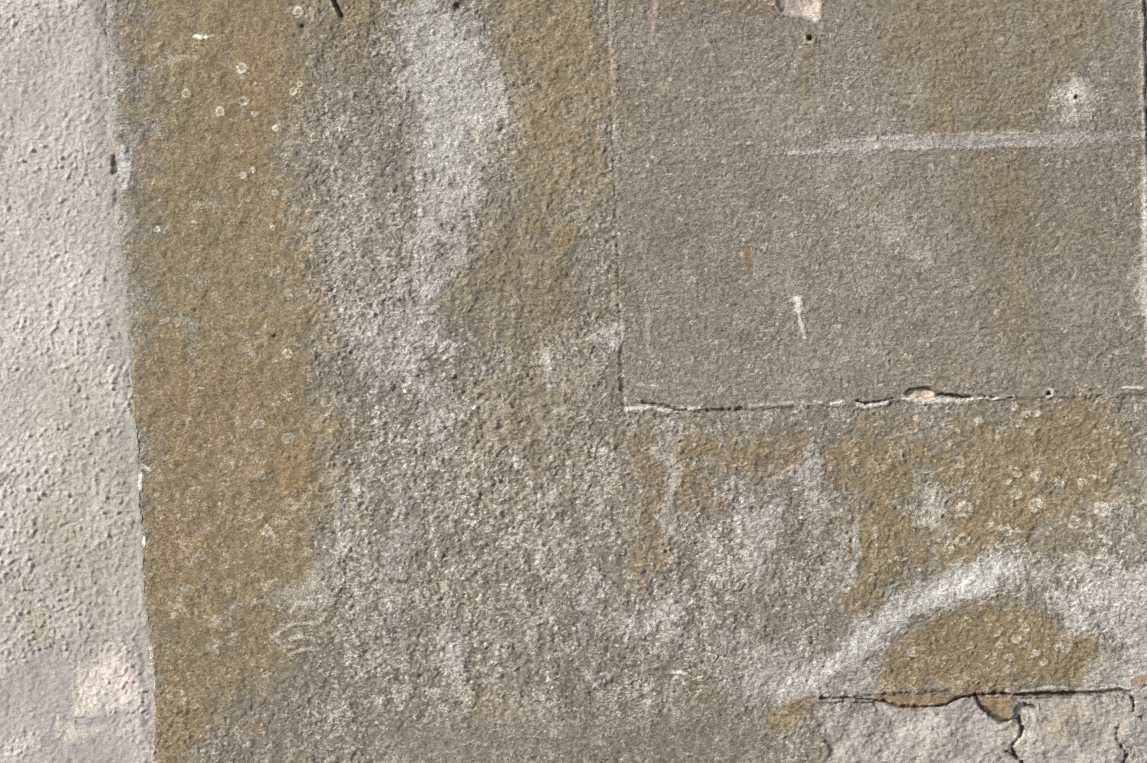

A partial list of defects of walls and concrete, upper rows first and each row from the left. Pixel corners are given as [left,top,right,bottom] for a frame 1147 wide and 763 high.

spalling [773,0,822,44]
crack [607,0,622,163]
water stain [106,0,399,763]
water stain [278,0,1147,739]
crack [617,346,1147,436]
spalling [903,385,940,399]
crack [872,683,1077,763]
crack [1113,701,1145,763]